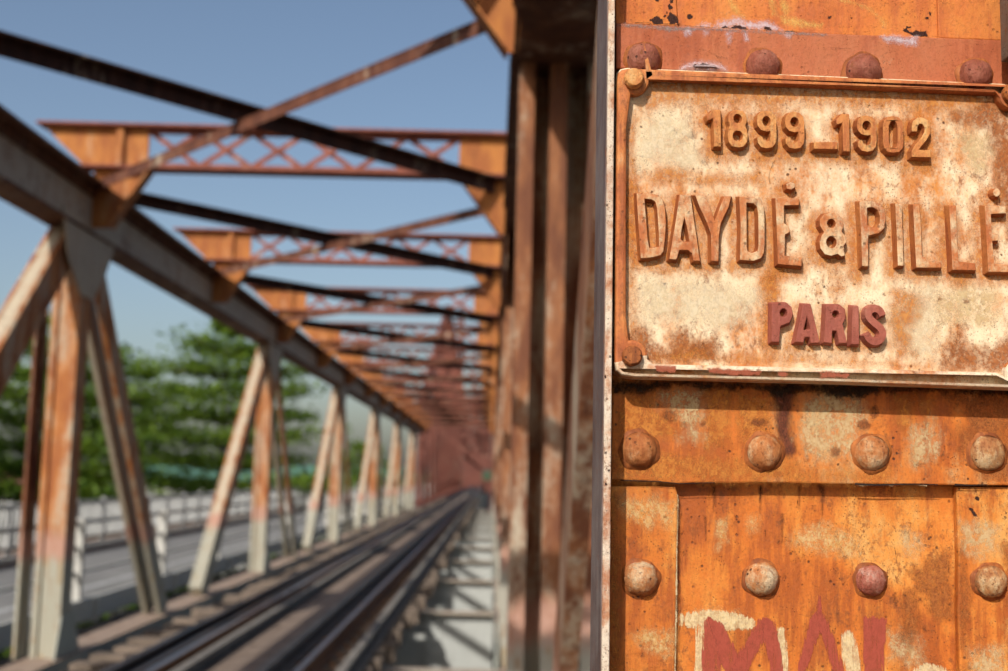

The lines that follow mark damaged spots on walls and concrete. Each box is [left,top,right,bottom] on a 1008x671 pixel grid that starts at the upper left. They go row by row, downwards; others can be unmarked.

corrosion [650,0,693,25]
corrosion [903,26,928,37]
corrosion [646,82,1008,293]
corrosion [617,121,880,501]
corrosion [892,291,919,356]
corrosion [942,333,1008,373]